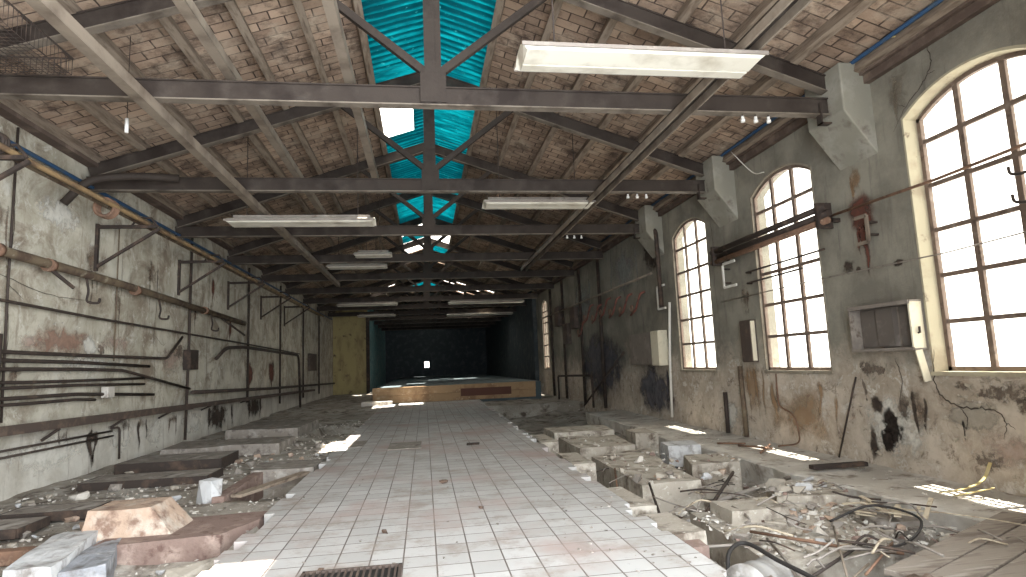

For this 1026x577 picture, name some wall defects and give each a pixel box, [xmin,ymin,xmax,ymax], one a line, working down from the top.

peeling [19,322,131,374]
damp [208,405,233,430]
damp [640,366,670,412]
spalling [859,362,927,458]
crack [933,359,1015,437]
peeling [941,377,1026,436]
damp [86,430,98,464]